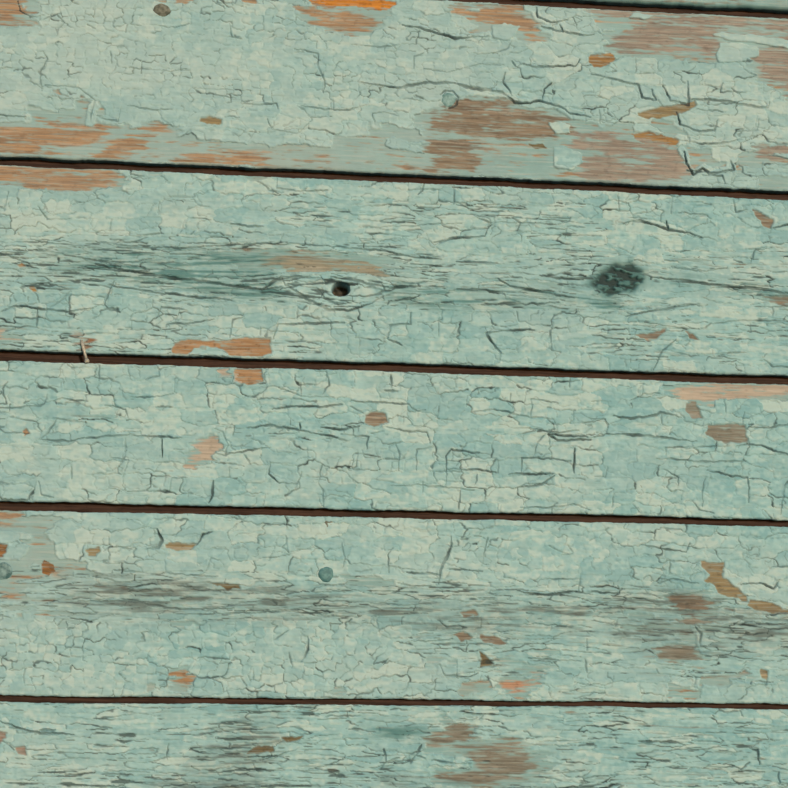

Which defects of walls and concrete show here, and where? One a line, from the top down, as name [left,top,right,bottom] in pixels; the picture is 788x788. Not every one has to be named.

peeling [549,121,570,134]
peeling [632,97,700,146]
peeling [529,143,583,171]